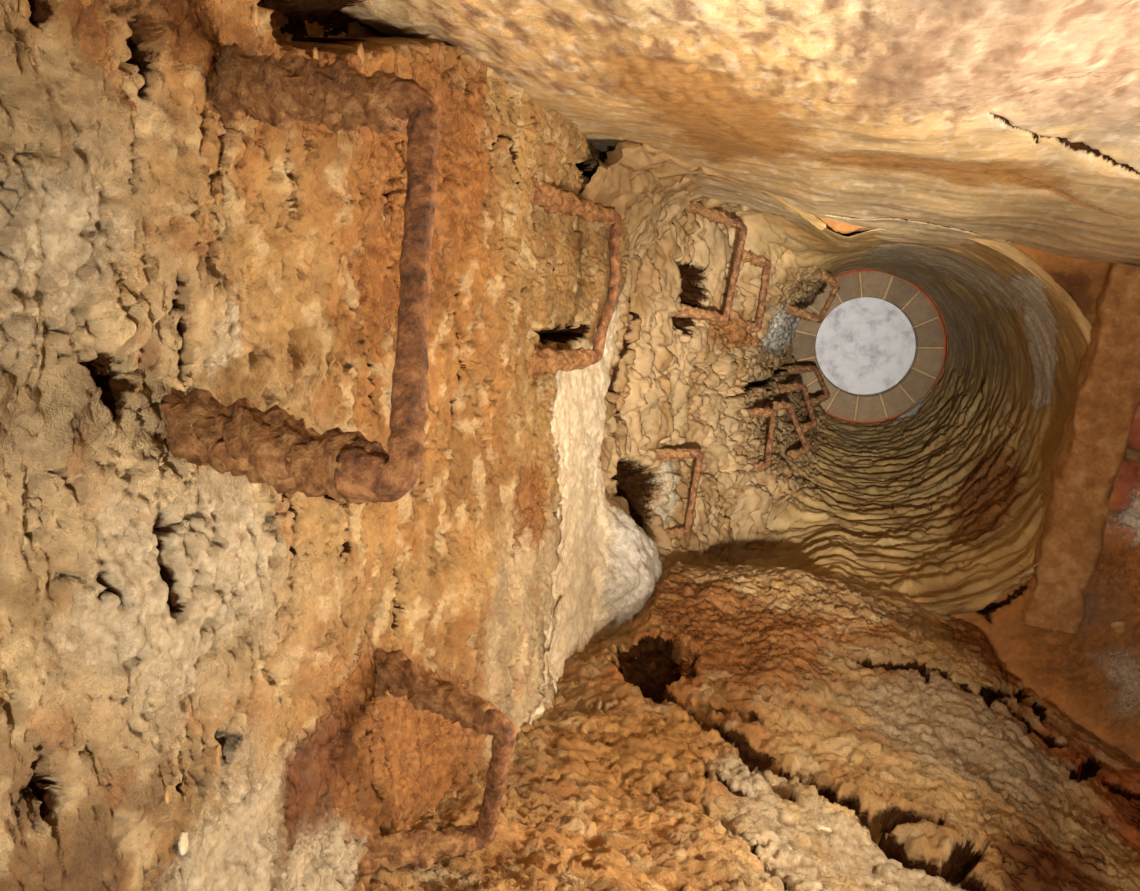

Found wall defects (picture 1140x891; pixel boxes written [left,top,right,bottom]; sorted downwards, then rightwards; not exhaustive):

rust [348,126,408,349]
rust [395,50,489,306]
crack [990,112,1140,175]
rust [708,311,760,346]
rust [209,435,254,472]
efflorescence [1108,489,1140,546]
rust [279,655,487,864]
crack [857,659,1140,801]